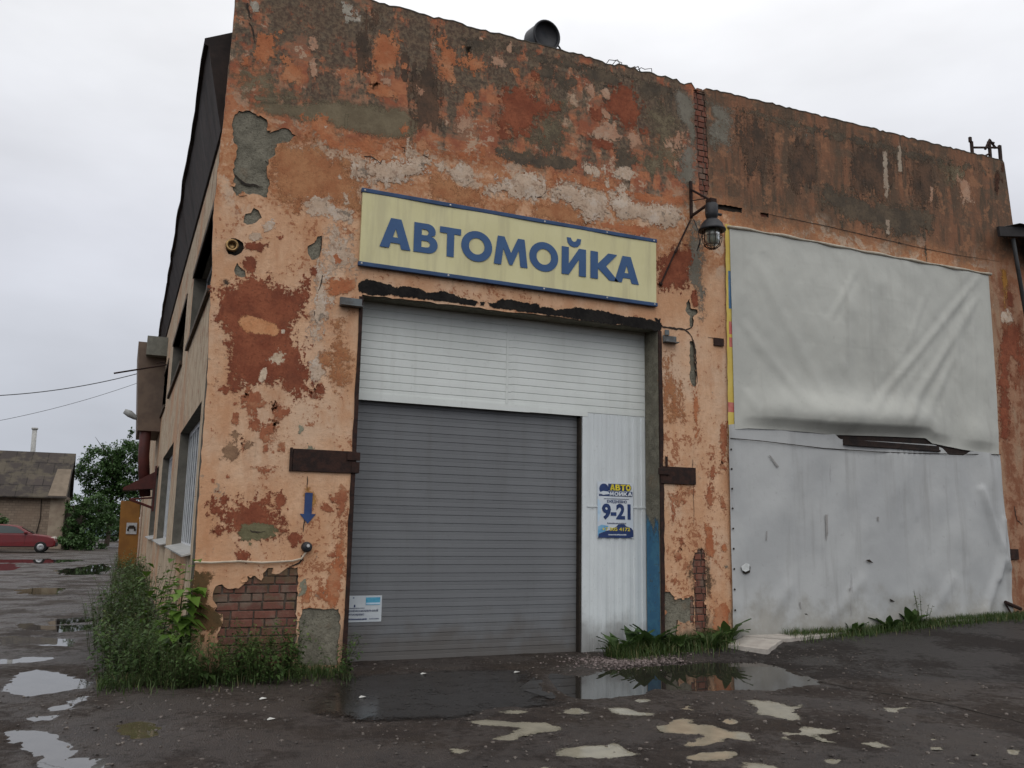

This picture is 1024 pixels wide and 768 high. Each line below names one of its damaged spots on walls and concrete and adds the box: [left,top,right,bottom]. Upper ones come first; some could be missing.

damp [232,25,444,139]
damp [353,9,382,84]
peeling [231,111,510,216]
peeling [531,203,650,236]
damp [461,36,990,262]
peeling [194,208,357,666]
flaking render [665,421,730,636]